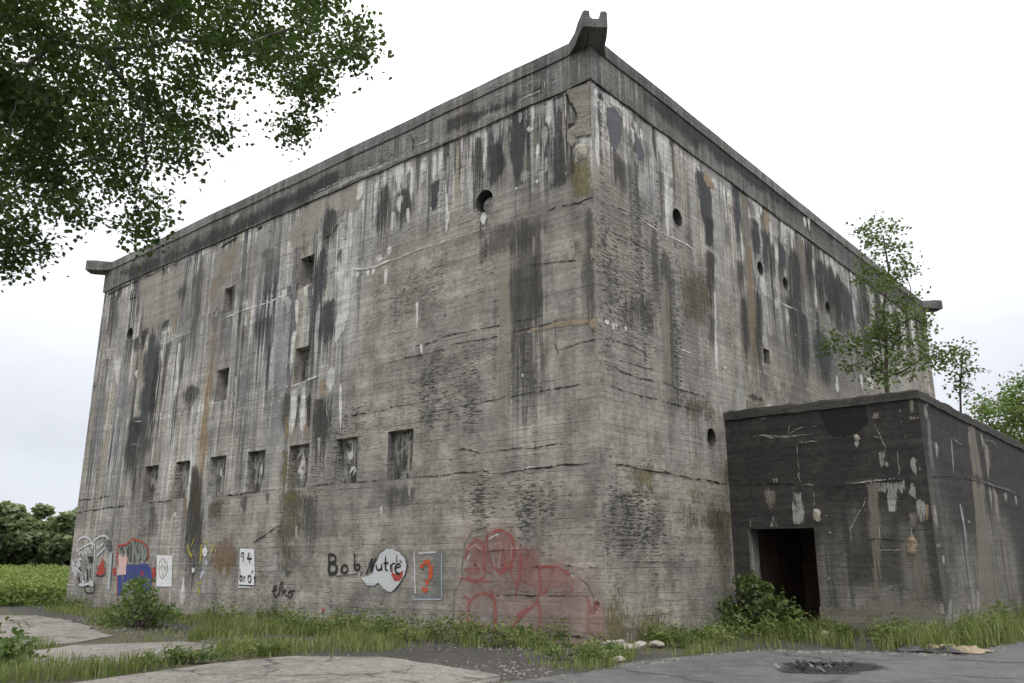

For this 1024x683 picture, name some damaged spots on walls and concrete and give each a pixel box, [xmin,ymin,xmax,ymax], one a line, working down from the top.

leakage [120,85,924,546]
rust [200,322,217,495]
crack [422,409,1016,551]
leakage [909,399,929,421]